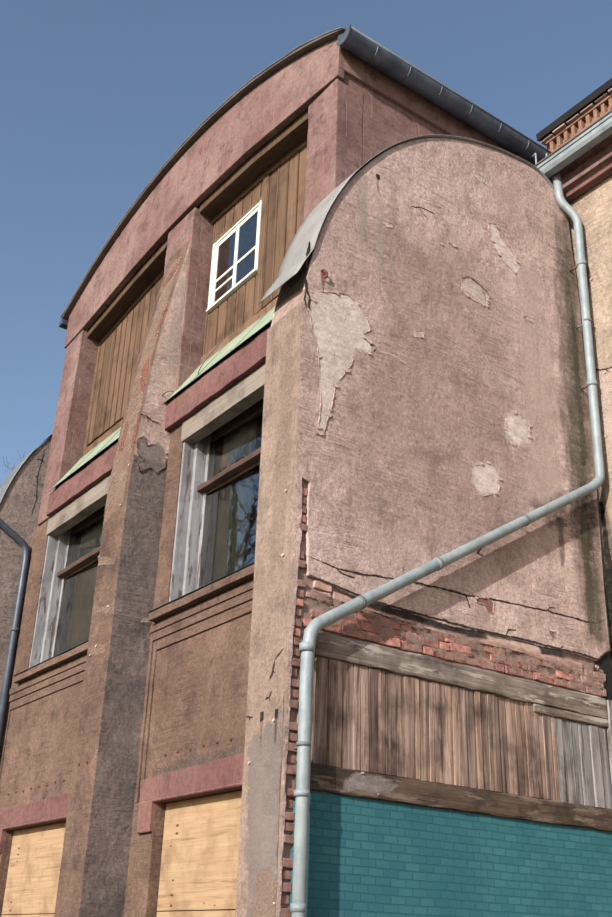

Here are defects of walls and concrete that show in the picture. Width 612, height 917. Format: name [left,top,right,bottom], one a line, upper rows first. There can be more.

peeling [488,221,520,274]
peeling [460,277,491,307]
peeling [310,290,375,435]
peeling [103,257,181,524]
peeling [505,411,532,446]
peeling [473,461,503,497]
crack [307,555,609,660]
spalling [475,596,495,613]
spalling [322,607,612,701]
peeling [244,487,352,917]
peeling [345,772,396,795]